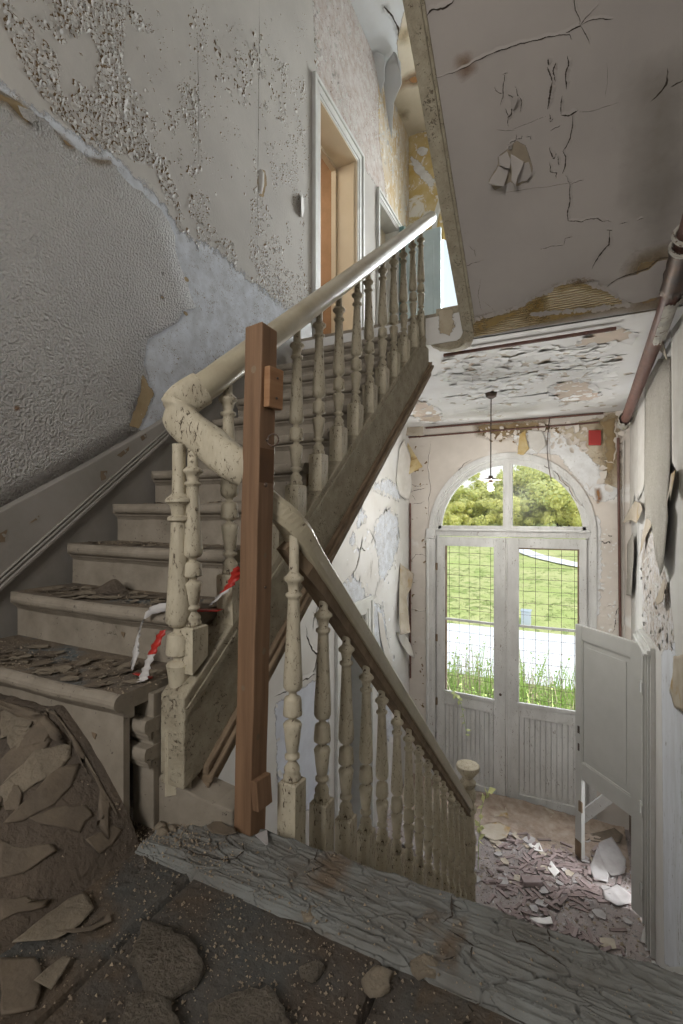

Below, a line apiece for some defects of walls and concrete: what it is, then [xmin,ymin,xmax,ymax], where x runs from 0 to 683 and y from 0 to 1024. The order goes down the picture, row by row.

crack [427,0,454,15]
crack [652,68,683,100]
flaking render [488,141,533,190]
crack [437,0,669,287]
flaking render [0,0,435,441]
leakage [633,253,668,275]
peeling [409,326,639,502]
flaking render [343,475,428,661]
flaking render [375,692,394,743]
flaking render [640,529,683,967]
crack [444,891,474,960]
crack [512,929,569,968]